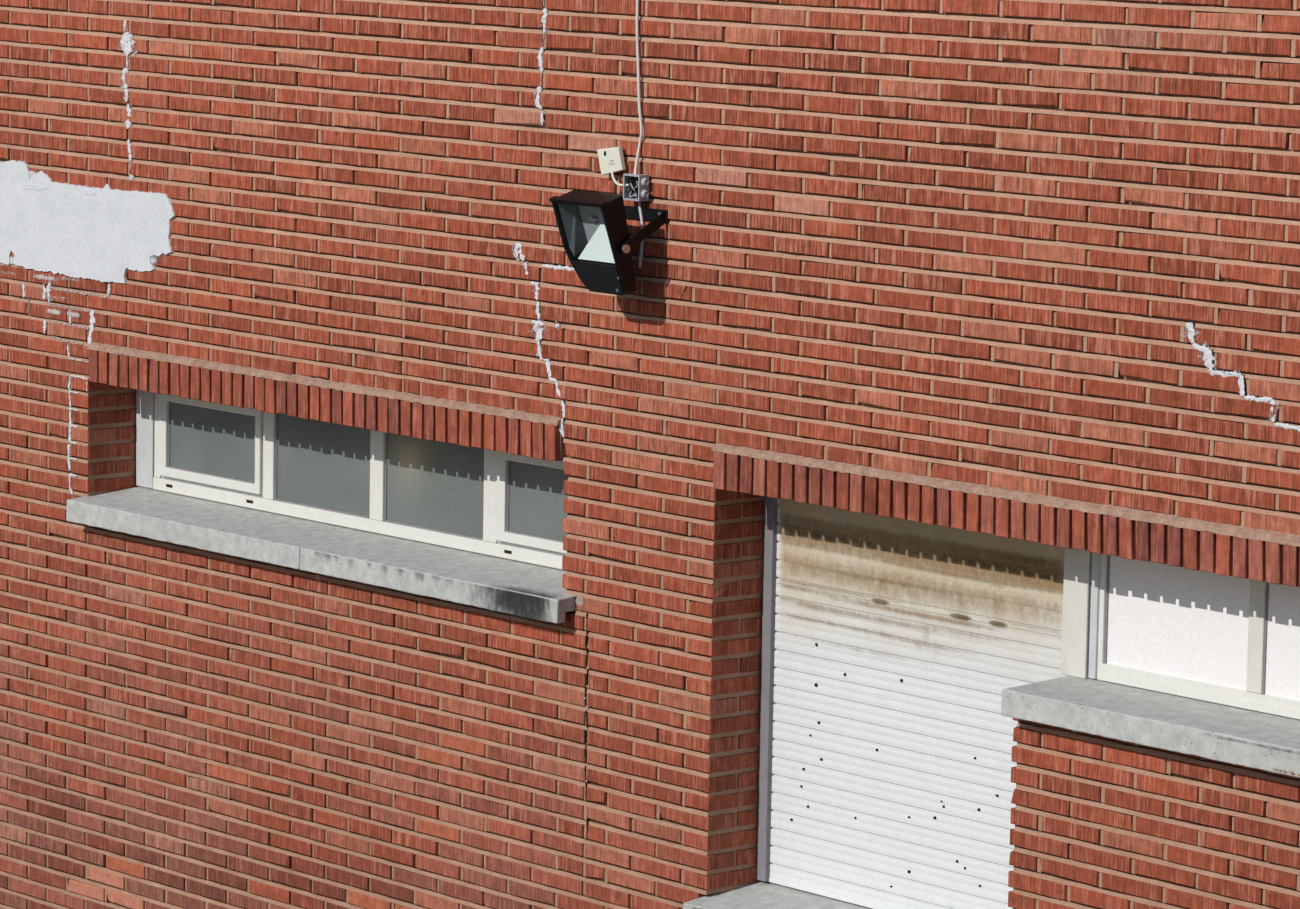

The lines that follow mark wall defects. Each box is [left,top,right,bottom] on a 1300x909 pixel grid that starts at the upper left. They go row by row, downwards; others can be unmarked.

crack [115,19,137,180]
crack [533,0,549,125]
crack [22,281,110,495]
crack [512,242,566,437]
crack [1180,322,1300,431]
leakage [782,499,1064,604]